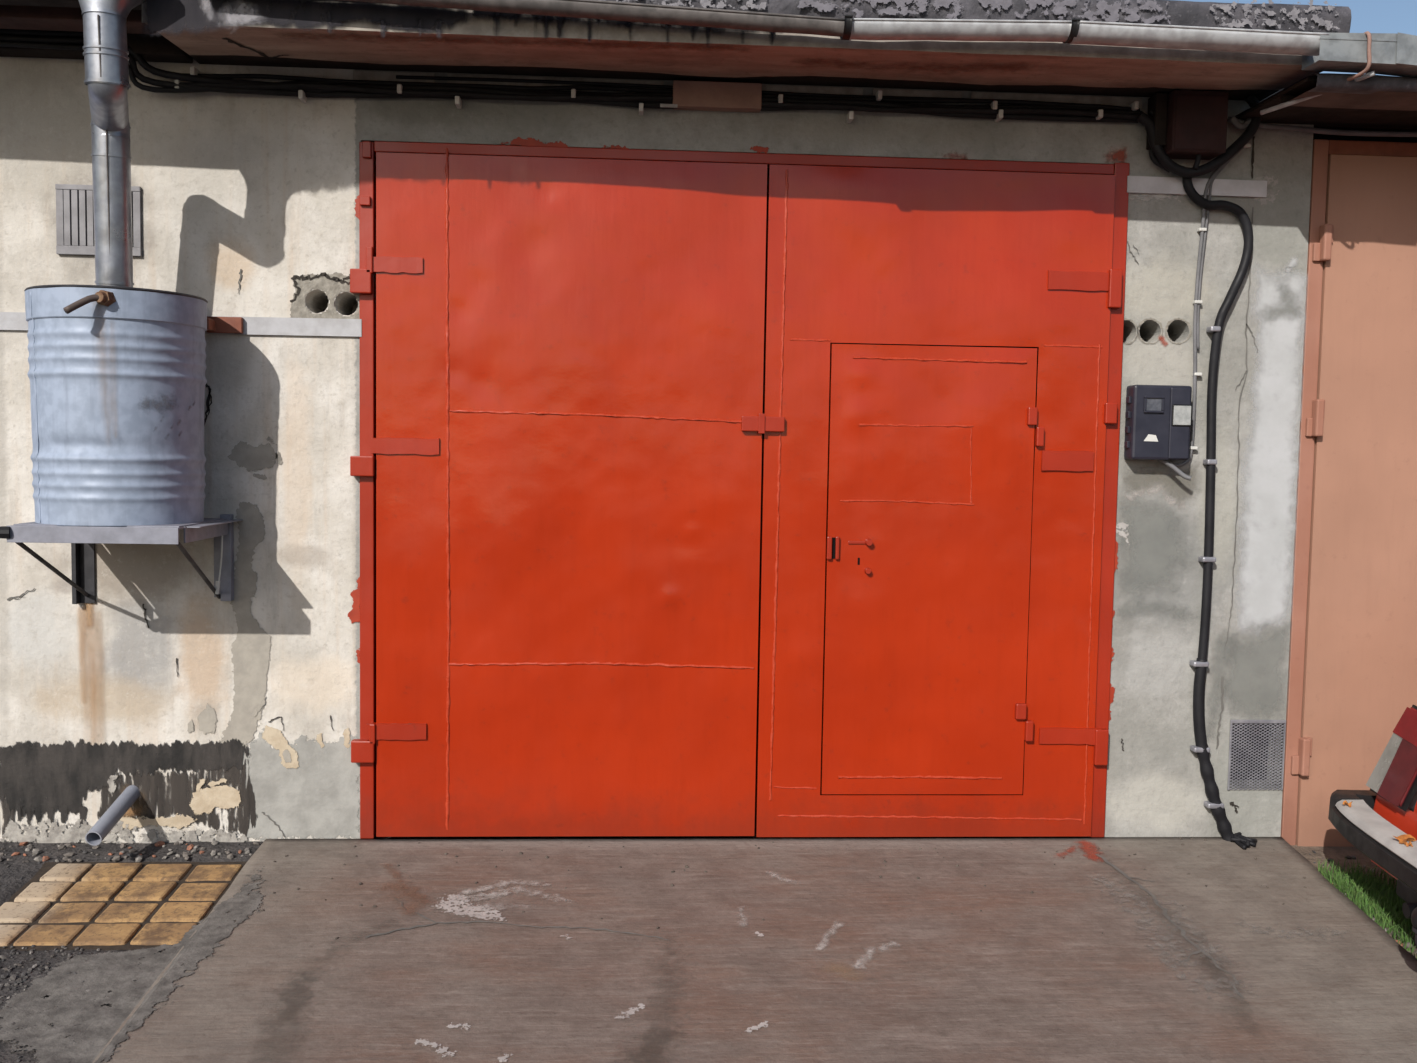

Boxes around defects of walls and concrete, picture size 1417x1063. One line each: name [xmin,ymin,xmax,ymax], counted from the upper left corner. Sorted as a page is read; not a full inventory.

damp [143,0,753,50]
spalling [290,272,360,319]
peeling [228,437,282,480]
crack [1216,136,1258,749]
peeling [0,502,360,844]